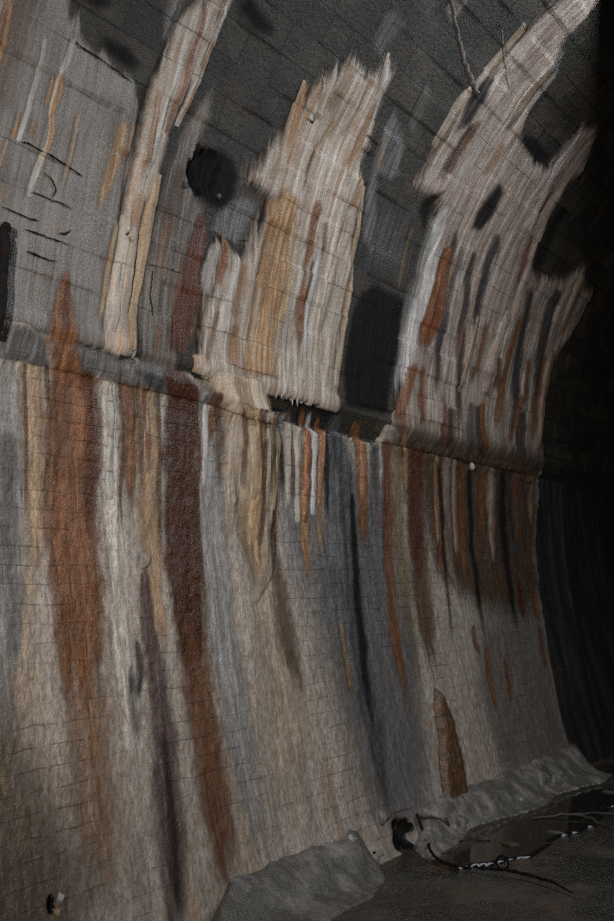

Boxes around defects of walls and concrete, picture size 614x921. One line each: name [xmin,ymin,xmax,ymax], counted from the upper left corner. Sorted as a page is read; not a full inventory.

rust [45,270,115,886]